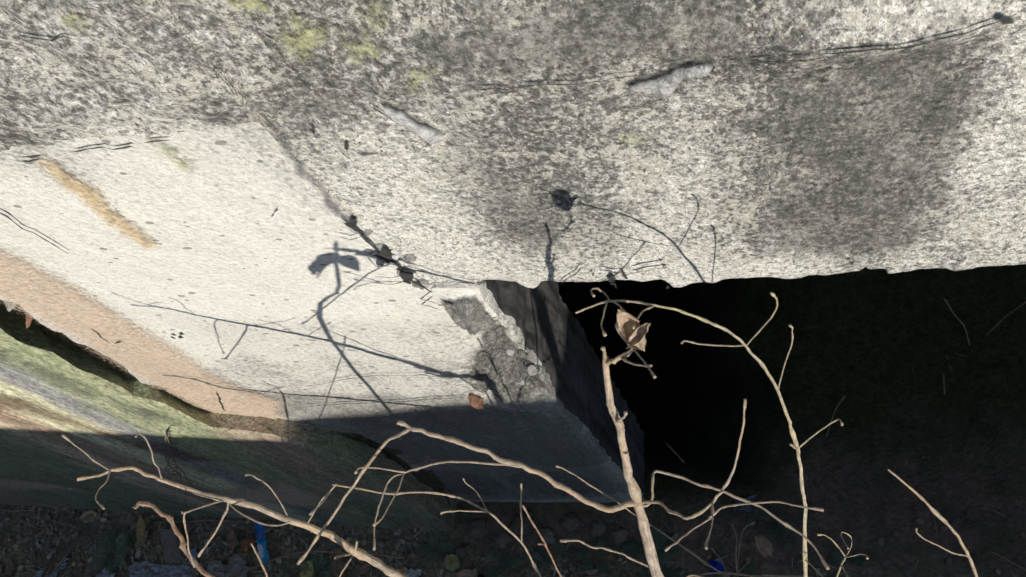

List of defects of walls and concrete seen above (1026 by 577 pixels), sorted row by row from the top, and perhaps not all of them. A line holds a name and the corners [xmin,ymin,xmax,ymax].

crack [0,212,68,254]
corrosion [36,157,161,250]
crack [338,215,470,309]
crack [561,264,668,289]
spalling [441,299,550,405]